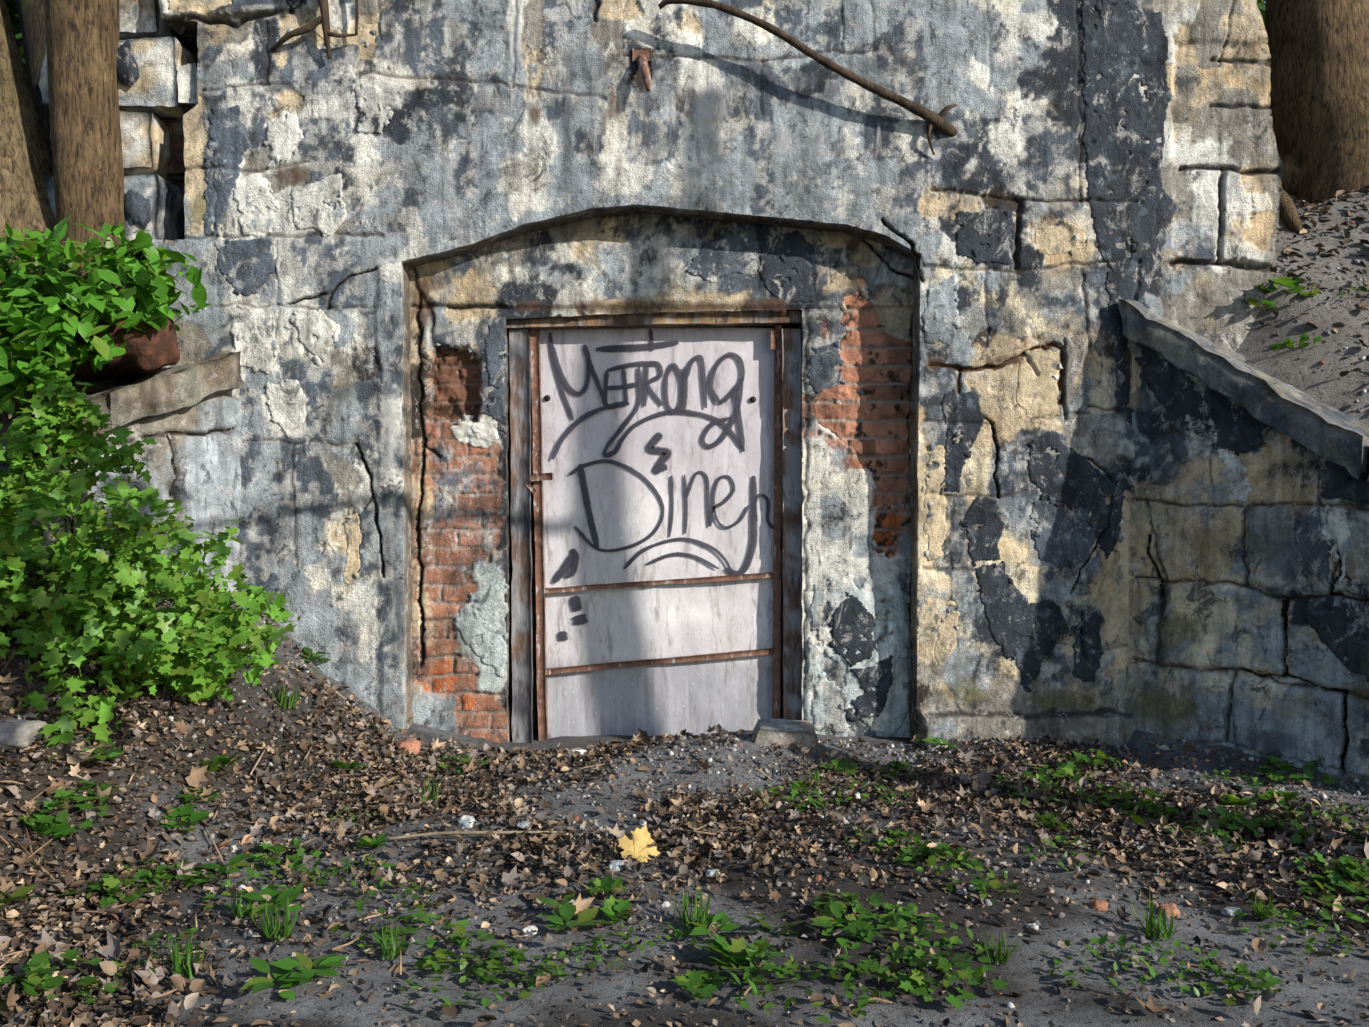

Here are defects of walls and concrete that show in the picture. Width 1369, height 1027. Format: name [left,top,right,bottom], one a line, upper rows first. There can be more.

peeling [1035,0,1172,323]
crack [289,267,377,310]
peeling [955,204,1015,265]
spalling [433,320,509,449]
crack [360,454,385,578]
crack [415,295,441,667]
peeling [452,578,509,678]
spalling [807,274,1135,693]
crack [1071,524,1109,657]
crack [1147,535,1164,597]